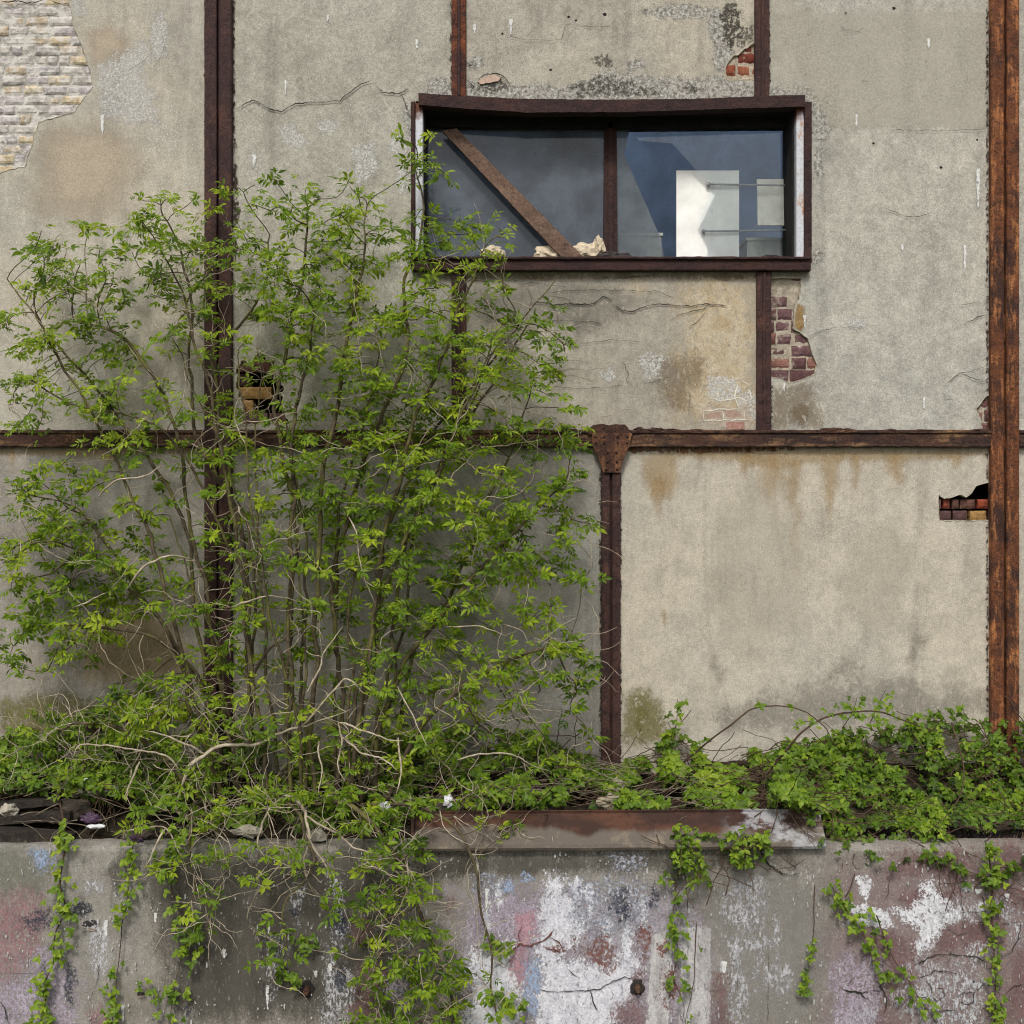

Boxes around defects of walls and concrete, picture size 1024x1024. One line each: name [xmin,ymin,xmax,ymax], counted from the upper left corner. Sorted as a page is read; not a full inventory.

spalling [0,0,169,174]
crack [237,80,411,131]
damp [477,81,508,92]
spalling [466,2,754,100]
damp [569,54,662,98]
crack [491,275,725,389]
damp [638,274,756,423]
spalling [771,277,818,384]
spalling [938,483,989,522]
peeling [453,850,682,1024]
peeling [716,875,807,998]
peeling [823,837,1024,1024]